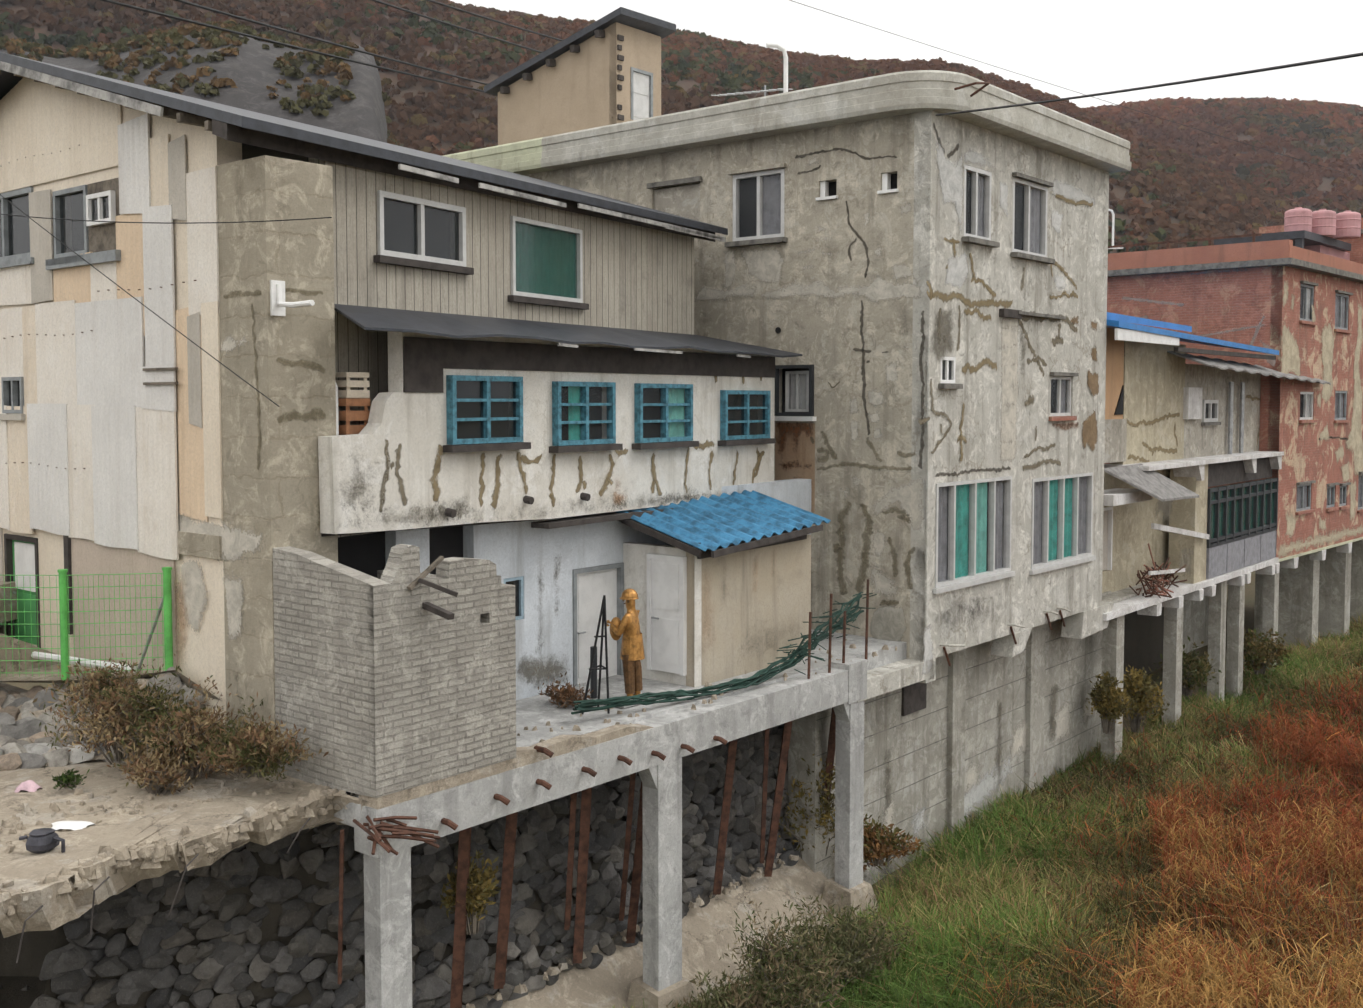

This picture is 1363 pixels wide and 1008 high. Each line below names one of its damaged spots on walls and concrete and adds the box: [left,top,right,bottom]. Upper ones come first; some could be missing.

crack [795,148,897,175]
crack [933,123,959,158]
crack [1056,193,1093,207]
crack [810,201,1078,477]
spalling [1071,316,1099,450]
peeling [1191,280,1301,380]
peeling [1278,304,1363,558]
crack [834,501,915,606]